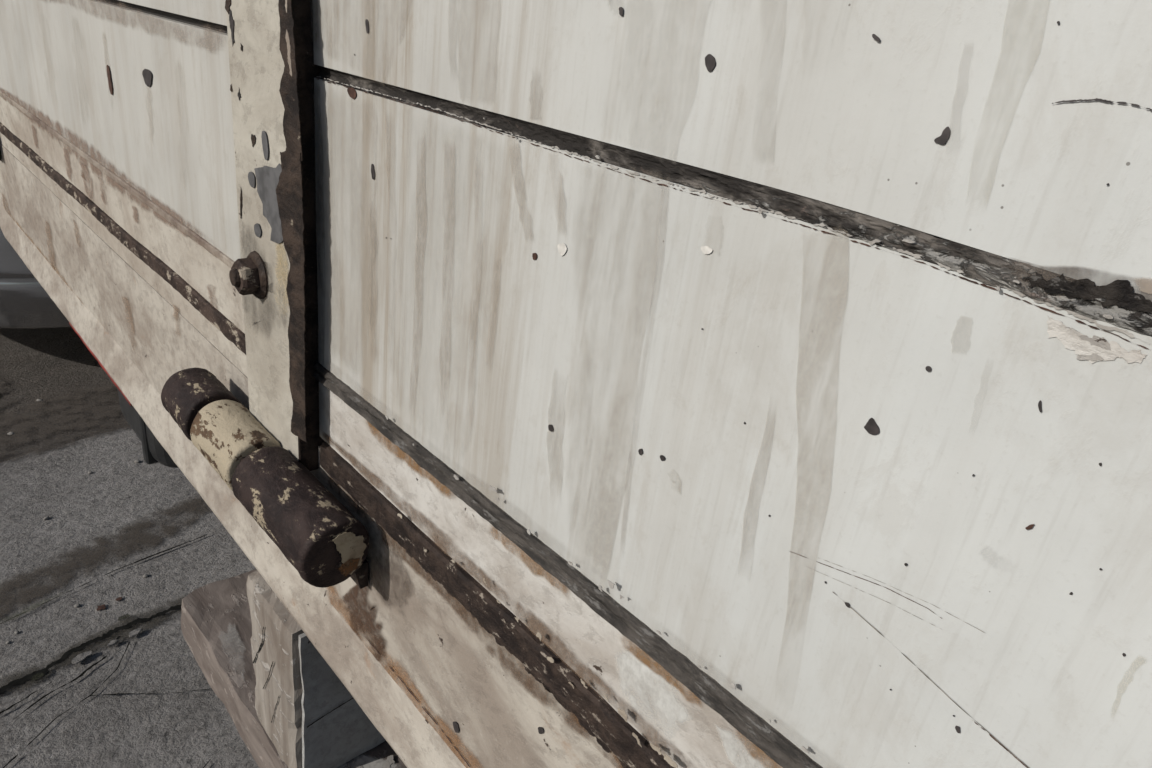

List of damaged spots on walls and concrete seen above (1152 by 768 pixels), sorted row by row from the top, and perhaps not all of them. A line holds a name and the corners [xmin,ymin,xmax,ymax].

peeling [225,0,243,52]
peeling [240,0,307,443]
spalling [1021,272,1152,313]
corrosion [324,434,449,555]
corrosion [367,421,450,496]
crack [0,604,182,714]
corrosion [329,585,426,719]
corrosion [378,524,554,704]
corrosion [517,604,610,696]
corrosion [630,646,699,703]
corrosion [435,720,478,768]
corrosion [564,711,589,736]